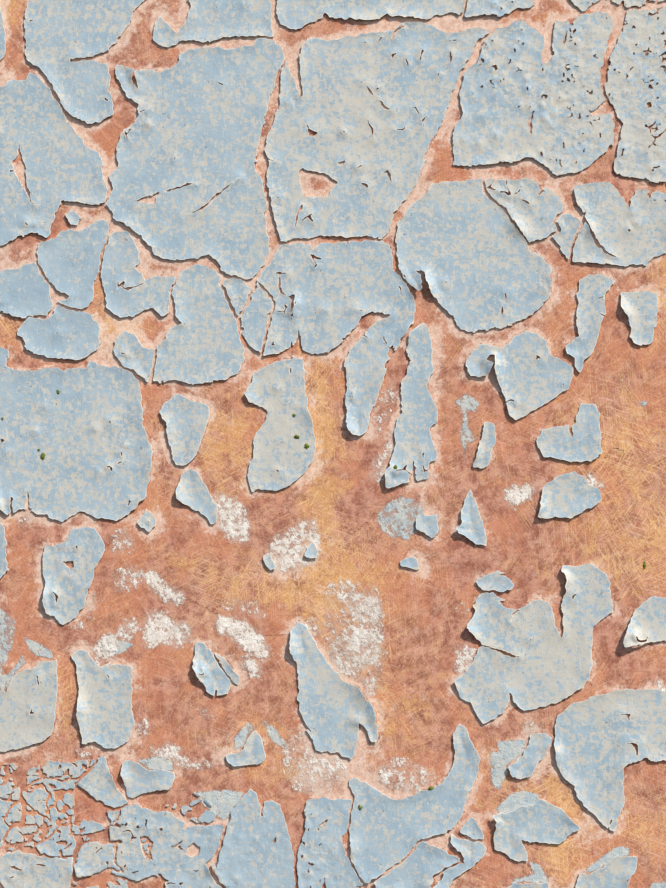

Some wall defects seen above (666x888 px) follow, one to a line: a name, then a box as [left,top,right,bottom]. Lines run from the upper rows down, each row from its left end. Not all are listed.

peeling [0,0,490,316]
peeling [0,220,245,522]
leakage [262,520,321,573]
peeling [127,177,666,888]
leakage [91,565,192,665]
leakage [215,599,272,679]
leakage [305,580,388,696]
peeling [0,522,406,888]
crack [0,822,166,888]
crack [206,815,231,888]
crack [269,789,328,888]
crack [351,839,425,888]